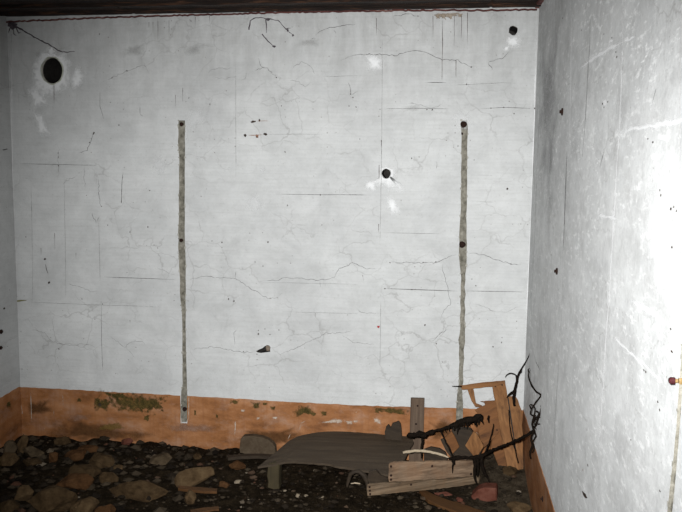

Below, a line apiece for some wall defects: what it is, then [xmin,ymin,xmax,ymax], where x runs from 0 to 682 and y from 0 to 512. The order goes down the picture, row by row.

crack [389,103,437,111]
crack [389,256,450,312]